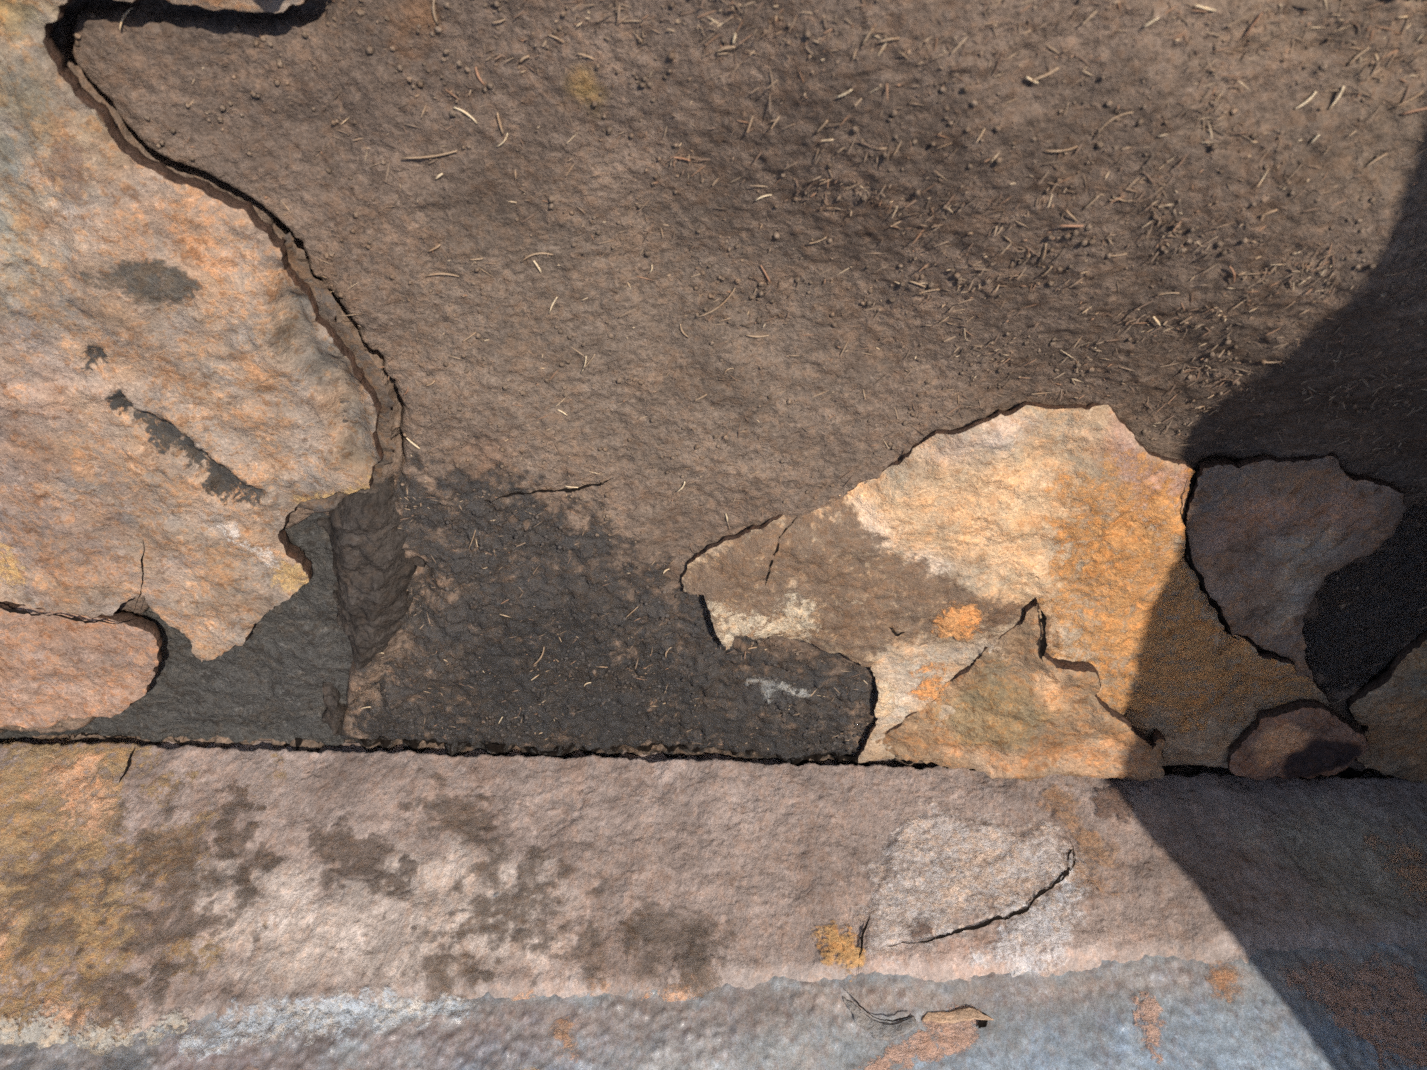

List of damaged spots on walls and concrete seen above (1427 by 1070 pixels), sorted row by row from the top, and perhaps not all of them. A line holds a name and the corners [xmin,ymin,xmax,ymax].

spalling [43,0,394,487]
peeling [0,506,353,746]
leakage [340,454,877,766]
spalling [681,514,783,589]
spalling [857,667,879,762]
crack [1039,607,1048,661]
spalling [849,401,1407,703]
crack [1180,475,1239,640]
spalling [1347,630,1427,733]
leakage [564,926,606,988]
leakage [620,901,737,998]
crack [847,835,1076,1022]